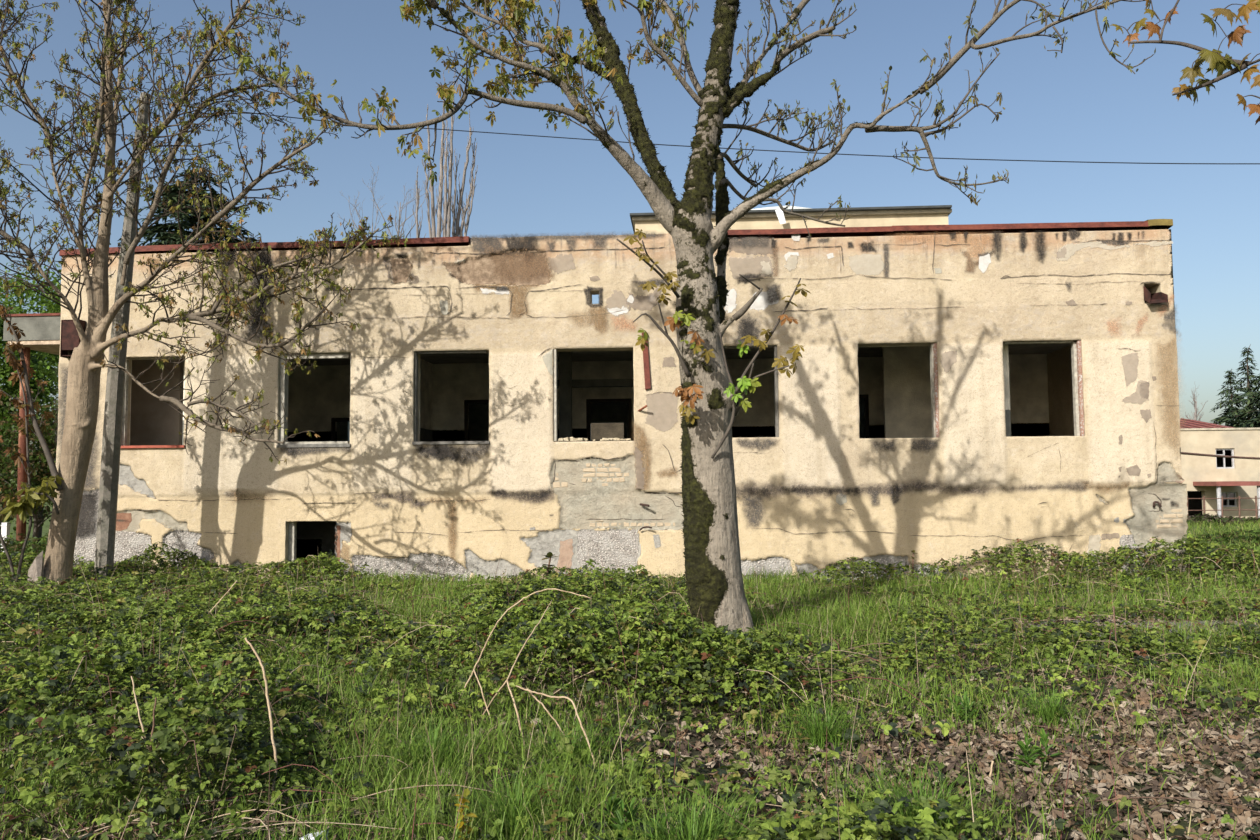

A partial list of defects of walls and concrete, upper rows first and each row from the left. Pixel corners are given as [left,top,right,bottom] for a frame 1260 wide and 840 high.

spalling [443,249,575,317]
flaking render [725,234,800,313]
damp [950,231,1002,273]
damp [1020,229,1080,260]
damp [416,443,490,463]
spalling [73,489,99,576]
spalling [114,464,214,570]
damp [374,492,456,558]
spalling [334,455,684,581]
damp [493,490,553,503]
damp [736,482,988,526]
spalling [1087,461,1188,576]